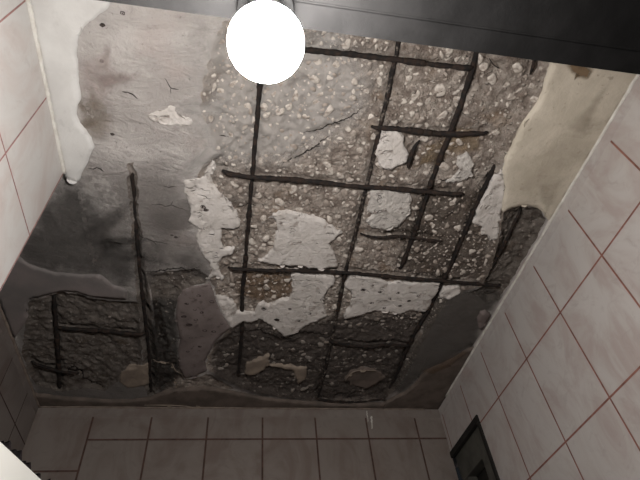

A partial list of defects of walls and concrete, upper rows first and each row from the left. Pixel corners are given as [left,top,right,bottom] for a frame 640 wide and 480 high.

flaking render [30,0,110,184]
crack [281,107,363,166]
corrosion [238,274,291,301]
spalling [360,307,394,330]
flaking render [477,310,490,330]
flaking render [383,346,474,409]